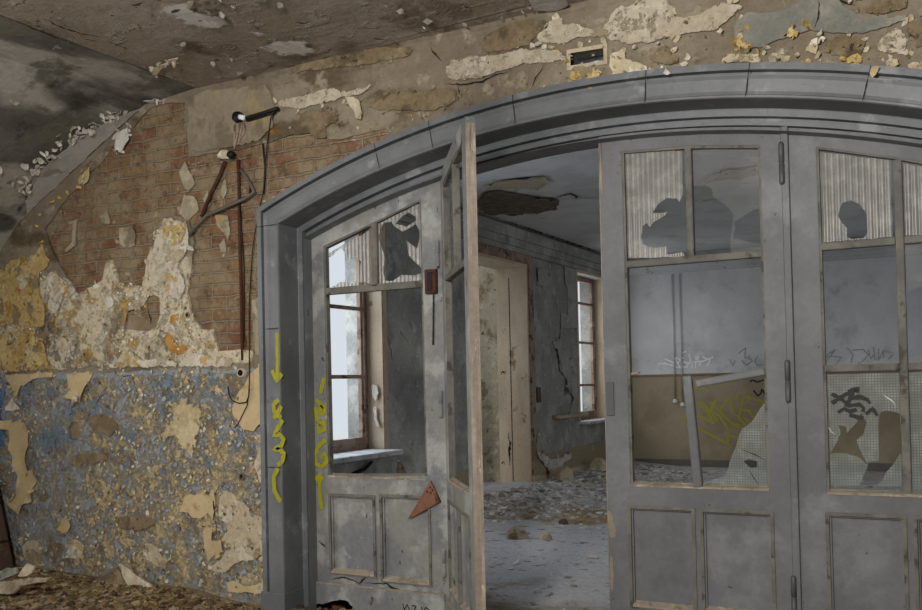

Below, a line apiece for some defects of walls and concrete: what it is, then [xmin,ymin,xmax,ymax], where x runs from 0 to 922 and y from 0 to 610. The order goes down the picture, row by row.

peeling [446,0,922,89]
peeling [149,57,179,78]
flaking render [290,47,412,78]
water stain [0,215,15,230]
flaking render [0,84,389,514]
peeling [114,509,154,531]
peeling [57,517,88,559]
peeling [141,544,171,569]
peeling [178,488,263,594]